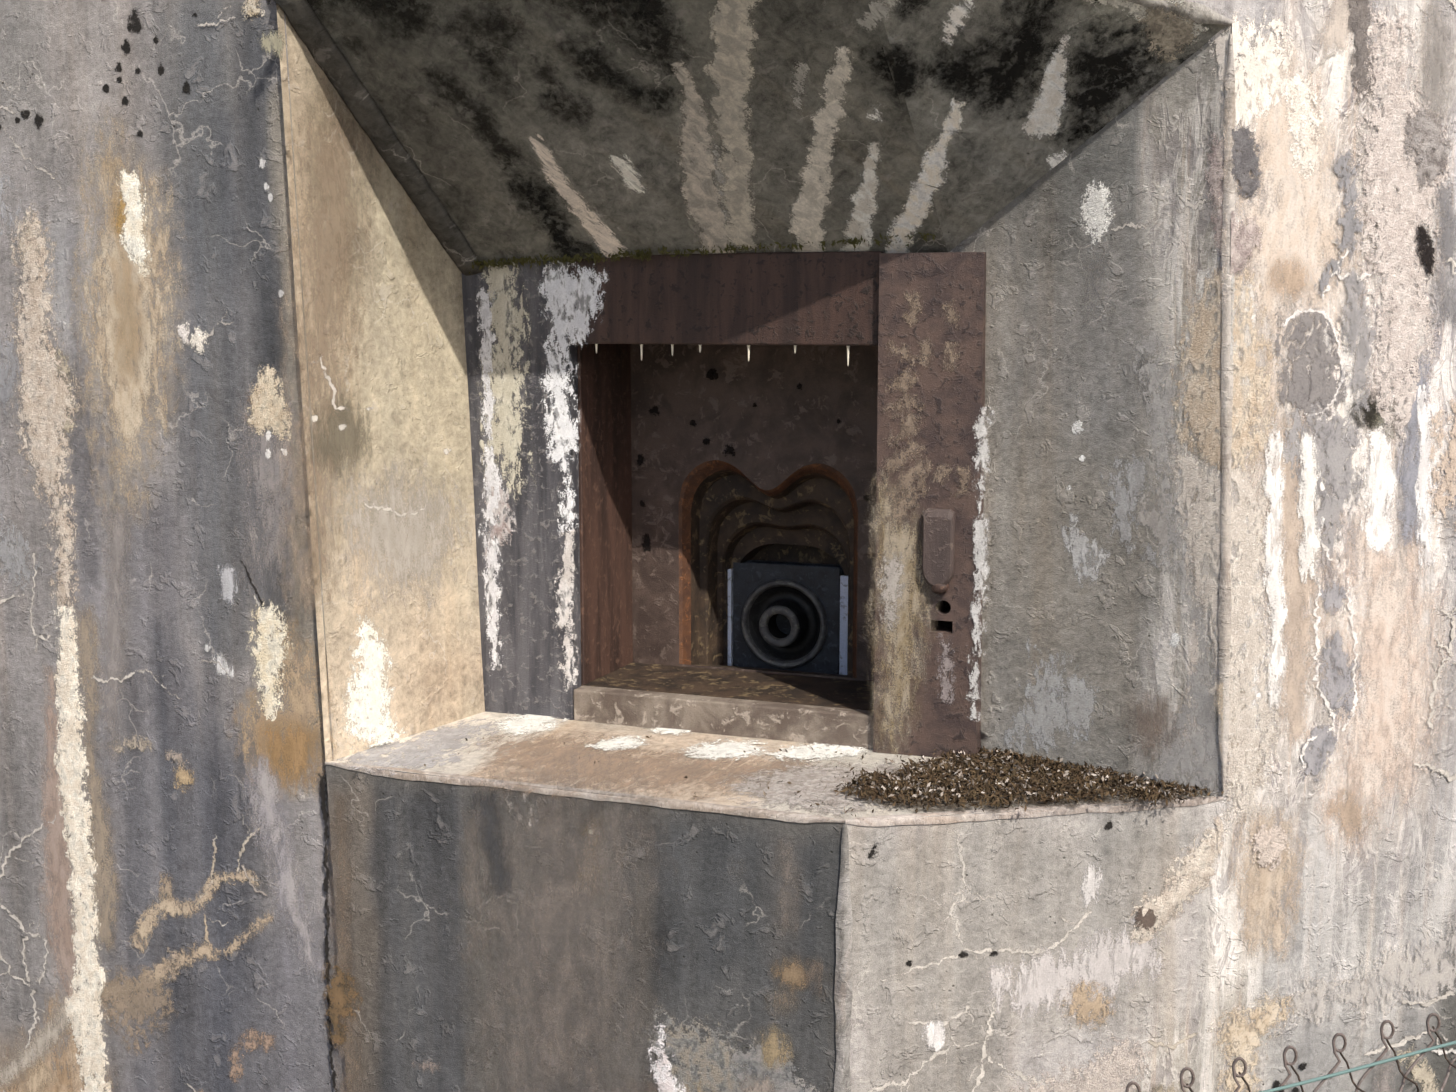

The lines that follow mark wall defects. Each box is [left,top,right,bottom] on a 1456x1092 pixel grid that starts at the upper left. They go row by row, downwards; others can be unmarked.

leakage [425,68,630,258]
leakage [537,0,762,254]
leakage [788,0,1170,253]
peeling [1086,0,1295,275]
peeling [476,262,609,692]
corrosion [642,533,651,552]
corrosion [679,420,955,754]
spalling [1269,0,1456,782]
crack [0,815,56,1056]
crack [97,821,274,1055]
crack [317,773,338,1092]
spalling [646,1007,820,1092]